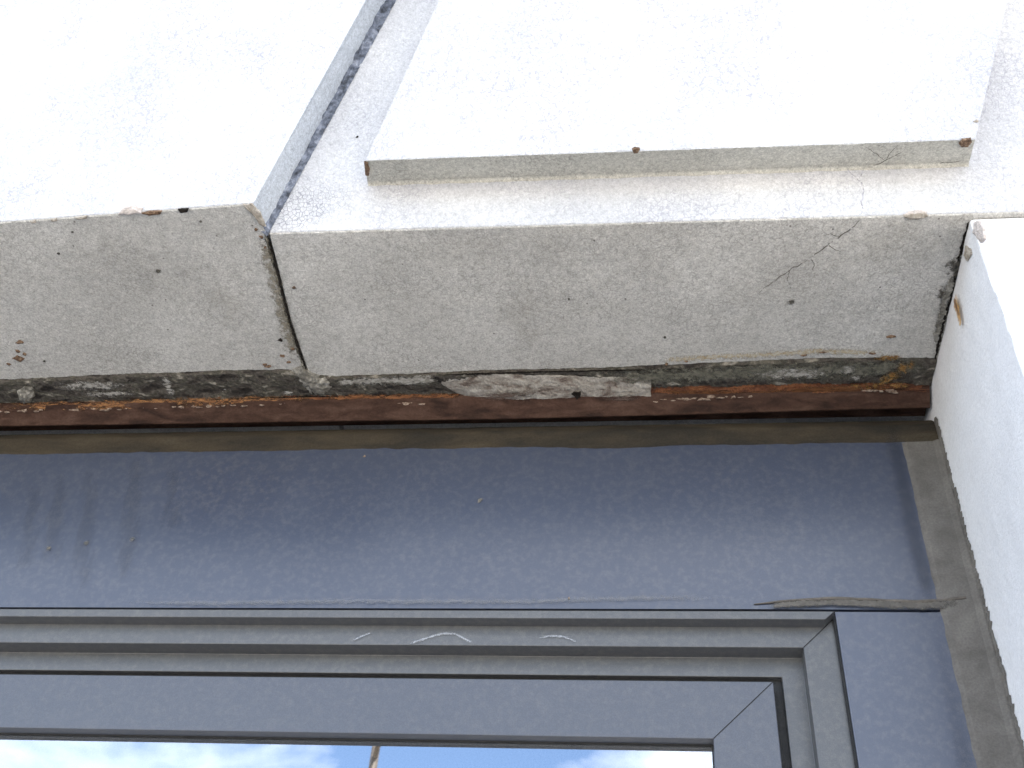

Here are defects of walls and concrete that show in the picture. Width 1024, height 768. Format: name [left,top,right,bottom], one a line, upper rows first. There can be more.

crack [759,145,900,293]
crack [266,192,325,369]
corrosion [14,394,462,411]
peeling [340,374,752,403]
corrosion [651,355,927,395]